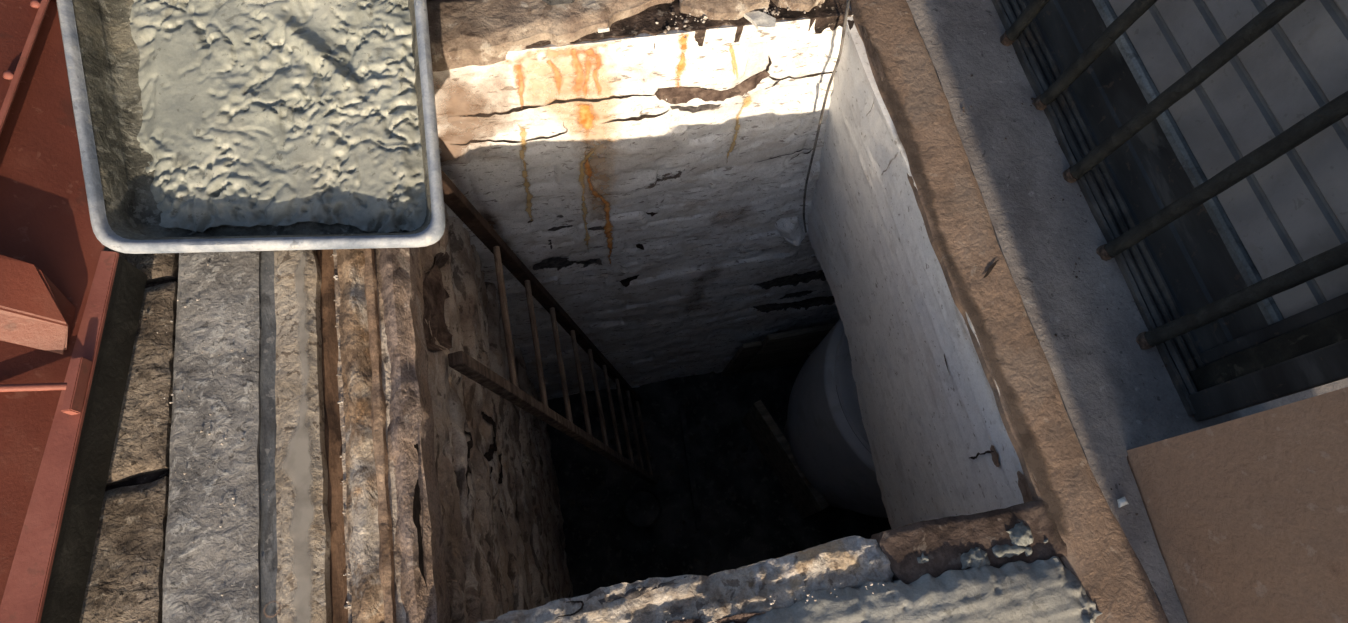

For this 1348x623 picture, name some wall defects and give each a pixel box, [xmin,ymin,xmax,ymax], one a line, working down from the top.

corrosion [506,44,606,130]
corrosion [676,34,688,86]
spalling [655,70,770,113]
corrosion [727,96,752,158]
corrosion [520,128,533,221]
corrosion [579,150,613,264]
peeling [533,215,604,271]
peeling [751,270,835,313]